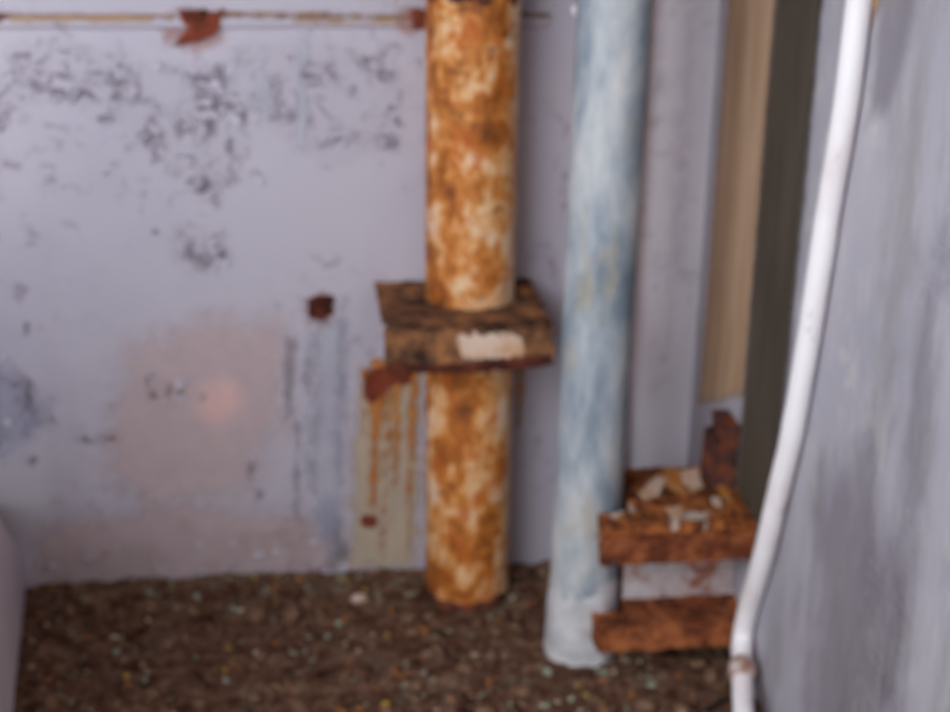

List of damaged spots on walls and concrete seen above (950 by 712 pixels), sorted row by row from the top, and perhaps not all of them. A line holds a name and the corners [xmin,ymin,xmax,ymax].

corrosion [5,13,172,23]
corrosion [216,11,361,24]
peeling [165,66,254,148]
corrosion [351,355,552,568]
corrosion [663,467,689,496]